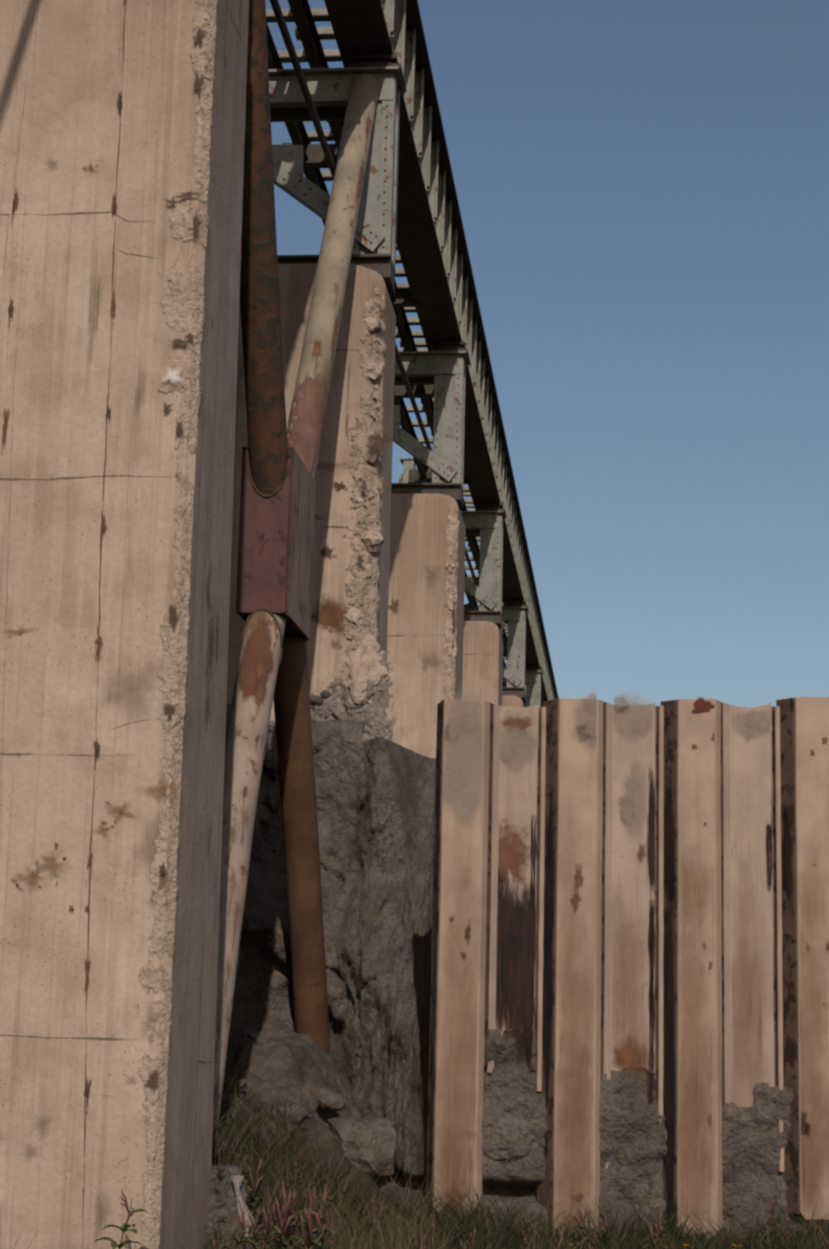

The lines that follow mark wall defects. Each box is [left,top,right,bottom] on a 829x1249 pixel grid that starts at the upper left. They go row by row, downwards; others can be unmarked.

crack [46,13,153,350]
crack [0,384,167,628]
spalling [134,0,217,1249]
rust [300,600,347,648]
spalling [309,285,399,741]
crack [0,786,122,1206]